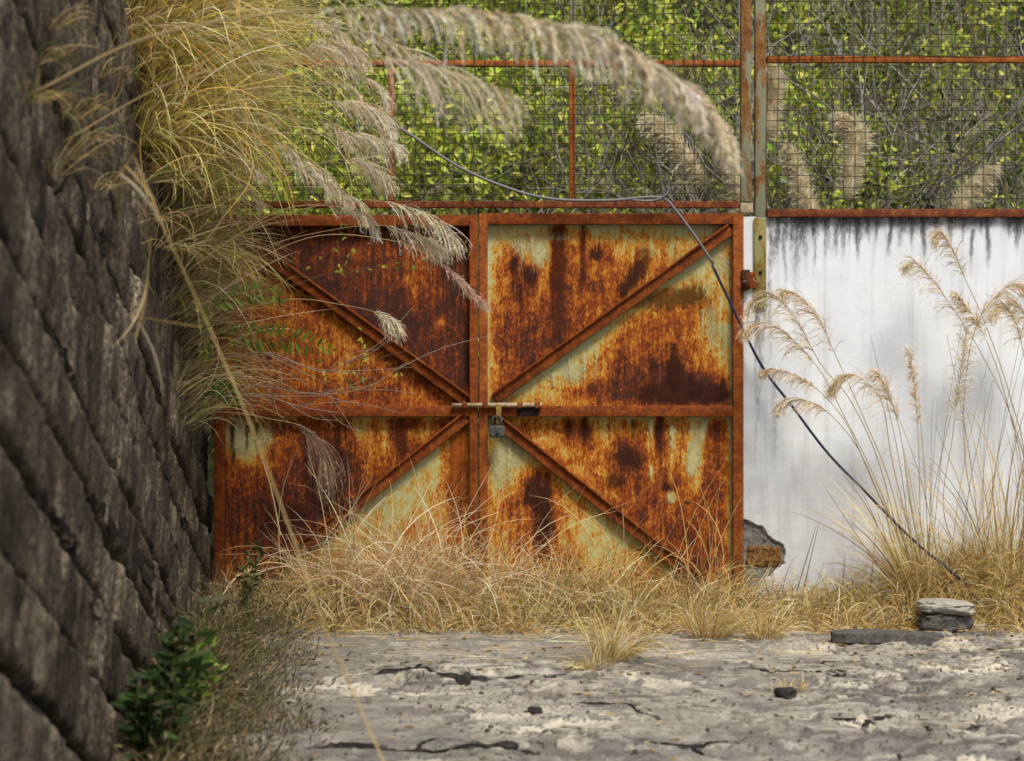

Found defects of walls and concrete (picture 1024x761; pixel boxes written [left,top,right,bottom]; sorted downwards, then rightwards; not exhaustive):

rust [582,226,603,260]
leakage [768,217,1024,254]
rust [509,258,536,310]
rust [619,249,650,296]
rust [636,343,728,405]
rust [231,422,258,447]
rust [260,422,345,529]
rust [447,424,469,521]
rust [608,448,641,487]
rust [525,472,554,554]
flaking render [744,520,785,591]
crack [369,660,603,679]